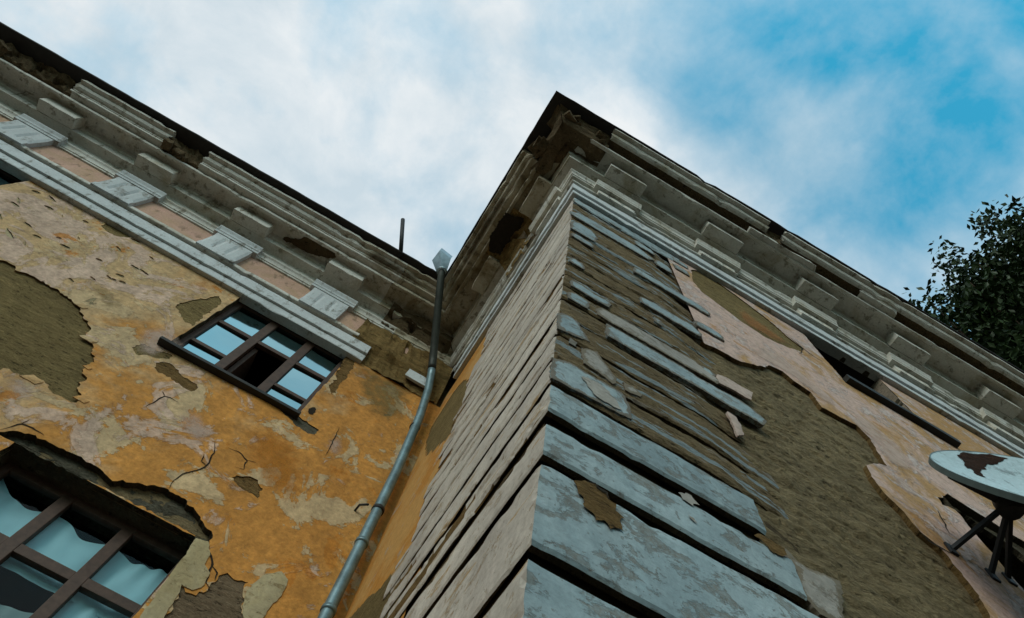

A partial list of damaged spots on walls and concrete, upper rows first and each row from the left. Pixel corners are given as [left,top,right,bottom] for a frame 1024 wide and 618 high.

peeling [0,214,41,245]
flaking render [283,235,336,259]
flaking render [486,208,536,276]
flaking render [0,262,98,403]
flaking render [176,297,221,326]
flaking render [133,344,197,391]
flaking render [549,199,983,618]
flaking render [5,437,99,484]
crack [169,443,253,488]
flaking render [234,476,263,498]
flaking render [942,504,1024,556]
flaking render [164,574,245,618]